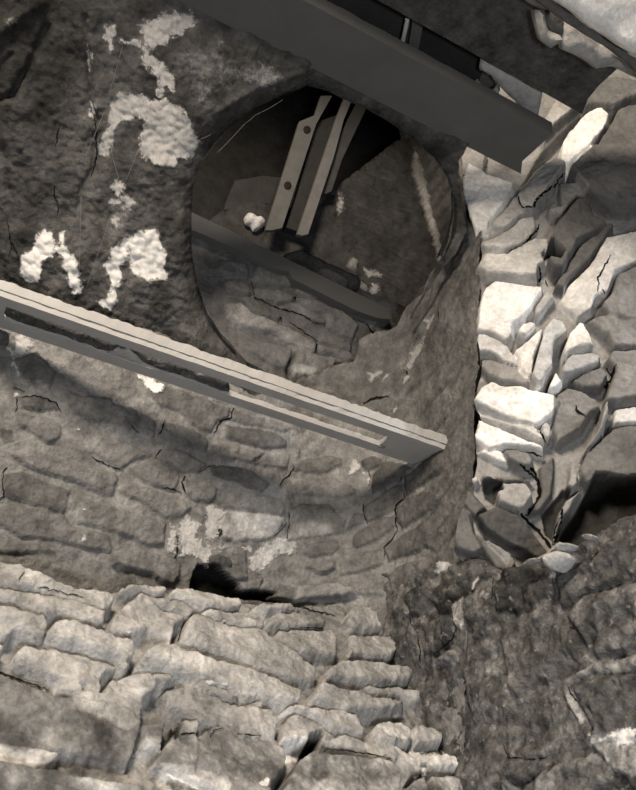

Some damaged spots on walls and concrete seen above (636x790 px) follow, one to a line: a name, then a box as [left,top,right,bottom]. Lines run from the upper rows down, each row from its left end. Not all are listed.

crack [14,387,61,412]
leakage [166,504,297,573]